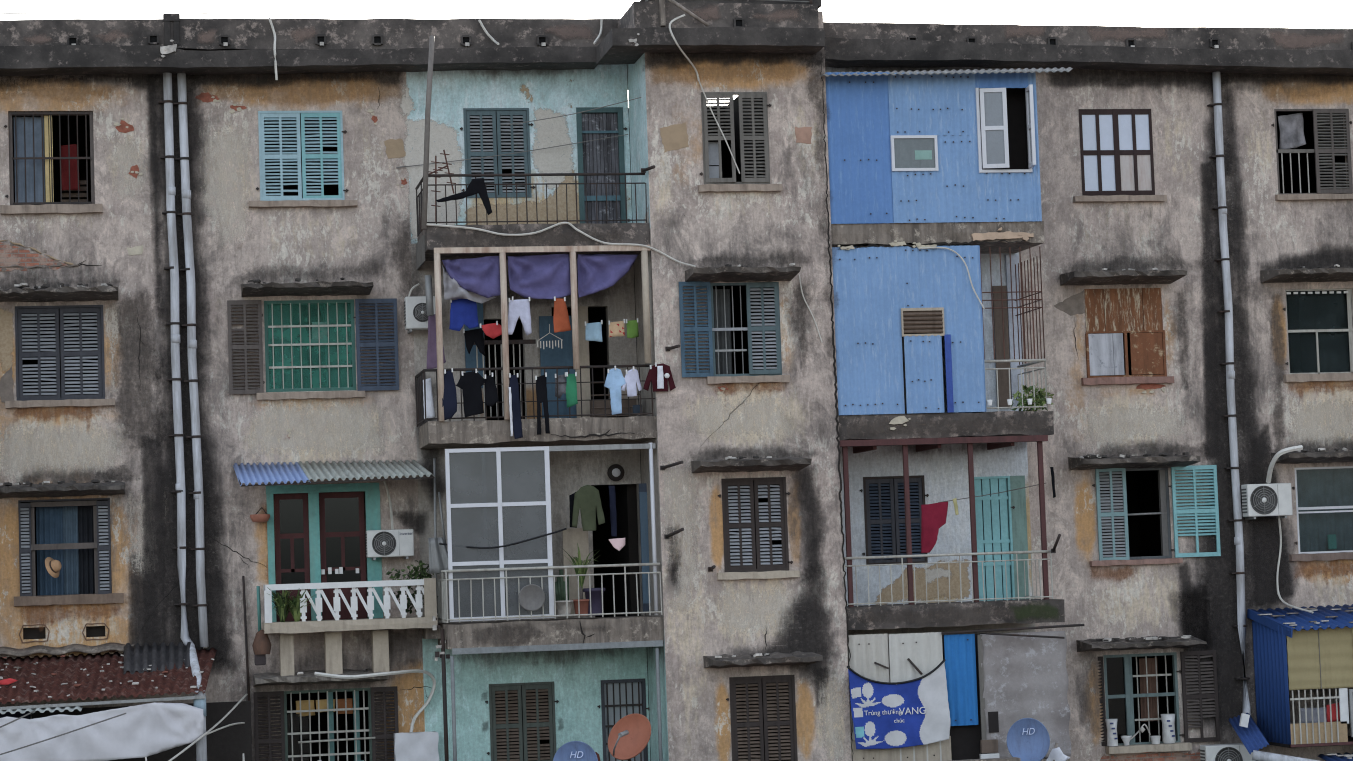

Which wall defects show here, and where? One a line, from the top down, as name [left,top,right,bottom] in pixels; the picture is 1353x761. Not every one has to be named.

flaking render [0,240,79,272]
damp [0,71,401,668]
peeling [396,84,580,241]
damp [1049,68,1353,128]
damp [1174,139,1353,724]
damp [721,467,846,758]